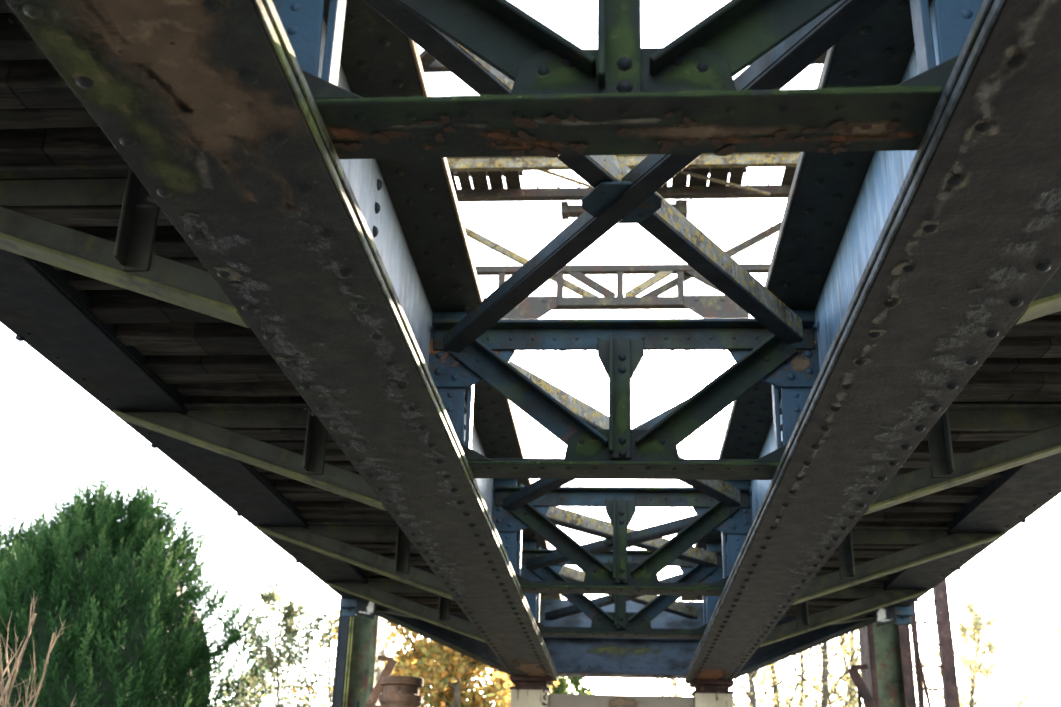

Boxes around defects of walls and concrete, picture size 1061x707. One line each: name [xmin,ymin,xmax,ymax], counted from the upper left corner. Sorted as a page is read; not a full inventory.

corrosion [327,115,455,158]
peeling [937,0,1058,204]
peeling [1005,188,1061,257]
peeling [180,213,468,596]
peeling [783,340,818,379]
peeling [790,220,940,496]
peeling [814,267,1027,545]